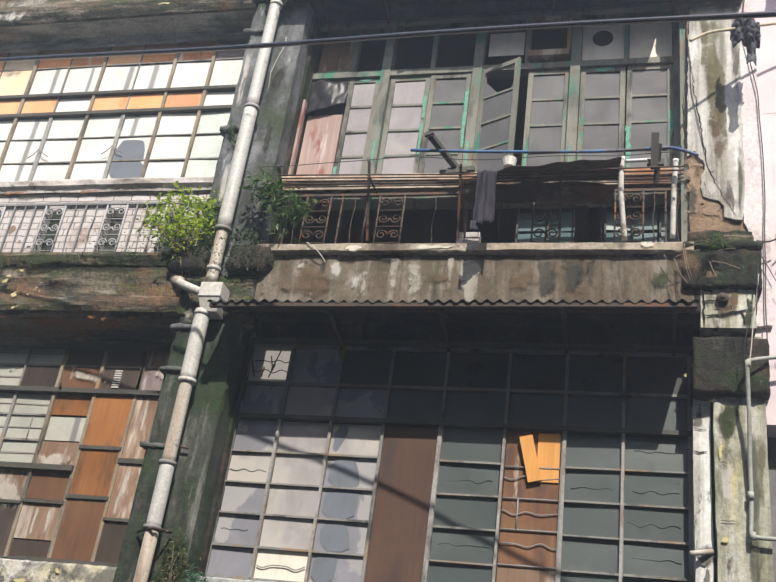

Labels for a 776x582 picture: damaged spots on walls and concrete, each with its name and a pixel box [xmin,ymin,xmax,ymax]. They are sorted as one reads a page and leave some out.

water stain [700,21,739,157]
spalling [684,155,722,221]
water stain [725,165,743,208]
water stain [373,254,399,285]
water stain [431,256,481,301]
water stain [538,260,594,294]
water stain [745,435,766,519]